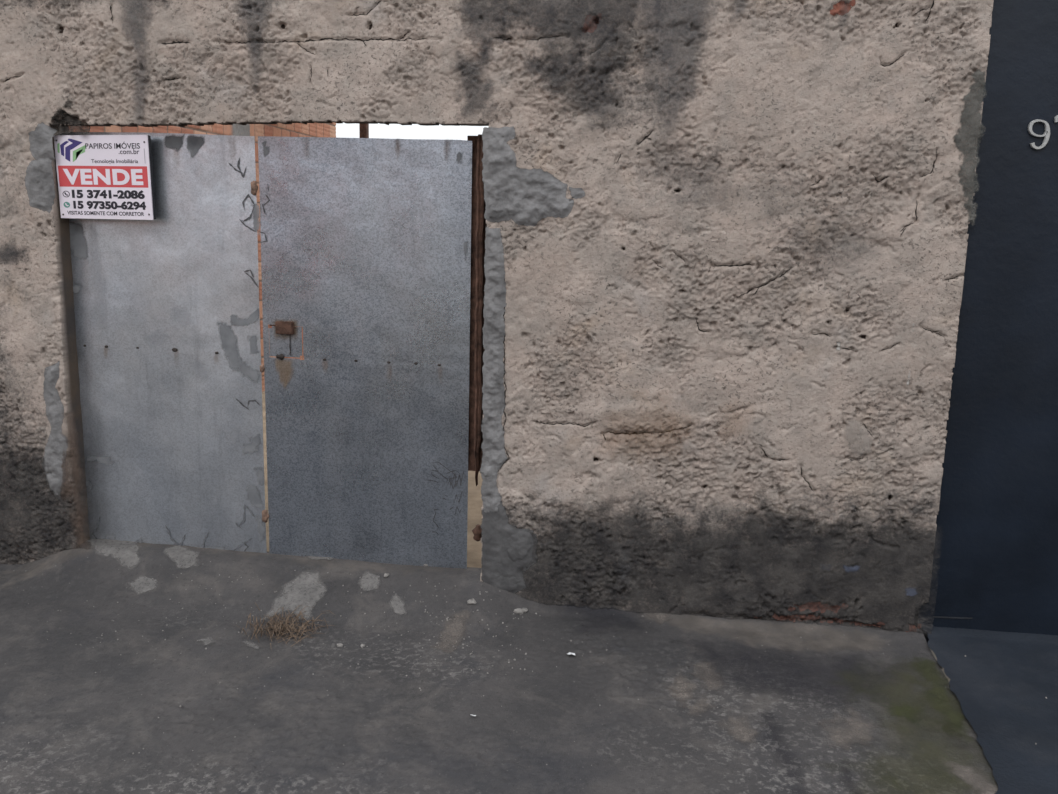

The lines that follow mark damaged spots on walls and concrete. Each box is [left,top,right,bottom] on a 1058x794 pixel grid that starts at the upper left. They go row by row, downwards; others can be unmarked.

crack [161,1,432,80]
water stain [457,0,636,116]
crack [652,252,793,300]
crack [537,421,691,440]
water stain [0,455,82,561]
water stain [526,502,936,635]